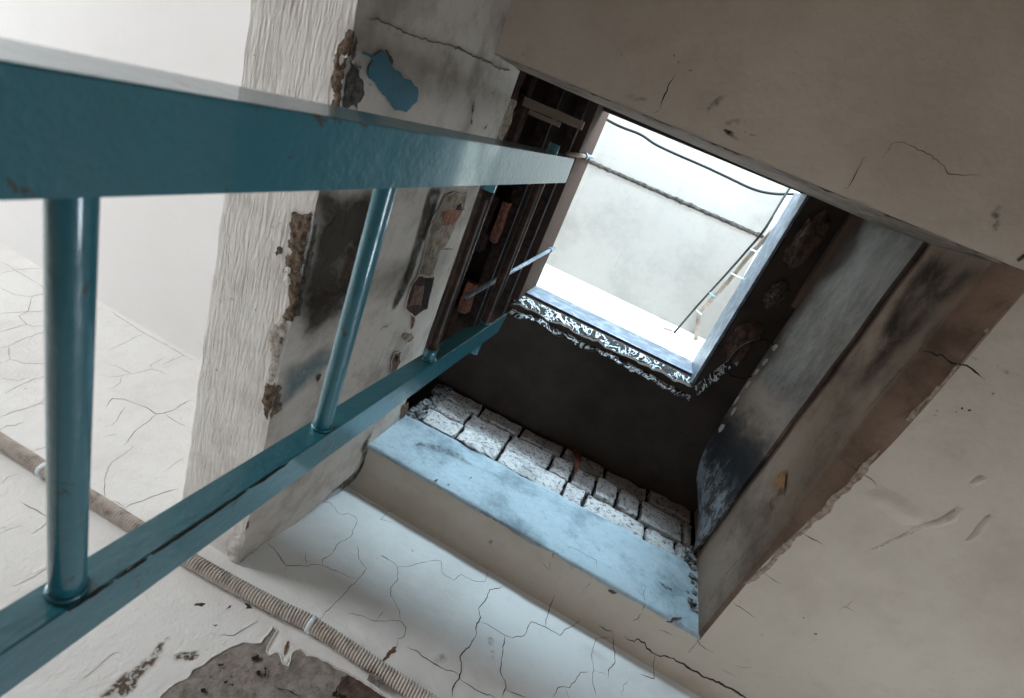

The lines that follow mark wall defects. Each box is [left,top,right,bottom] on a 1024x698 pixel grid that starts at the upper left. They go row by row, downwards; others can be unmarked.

spalling [330,29,365,109]
crack [367,18,510,71]
crack [847,142,967,188]
crack [1,263,44,428]
crack [104,312,192,507]
spalling [262,211,318,419]
peeling [389,191,467,374]
leakage [874,259,966,364]
crack [862,313,985,415]
crack [251,492,750,698]
peeling [102,642,165,697]
flaking render [158,626,388,698]